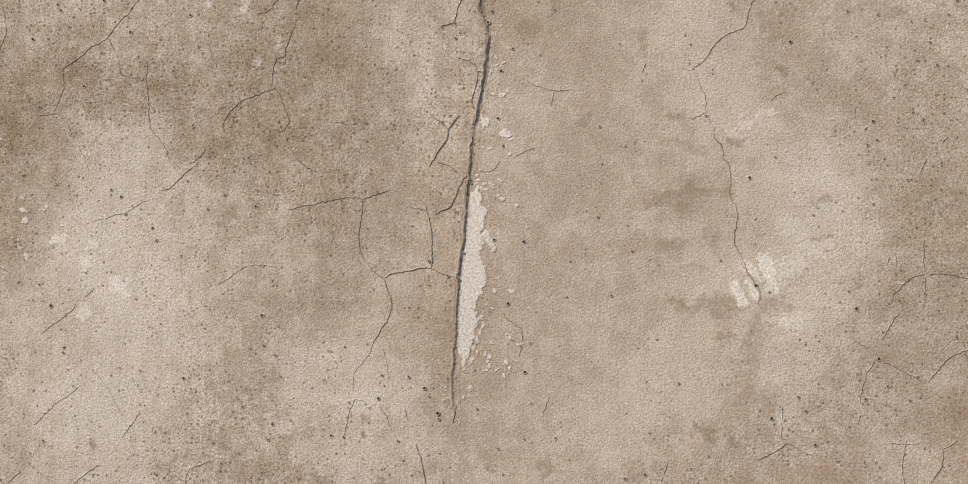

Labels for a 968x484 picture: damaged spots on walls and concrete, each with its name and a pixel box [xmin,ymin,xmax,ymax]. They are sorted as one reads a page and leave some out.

crack [290,57,529,428]
peeling [456,169,520,387]
crack [681,0,762,308]